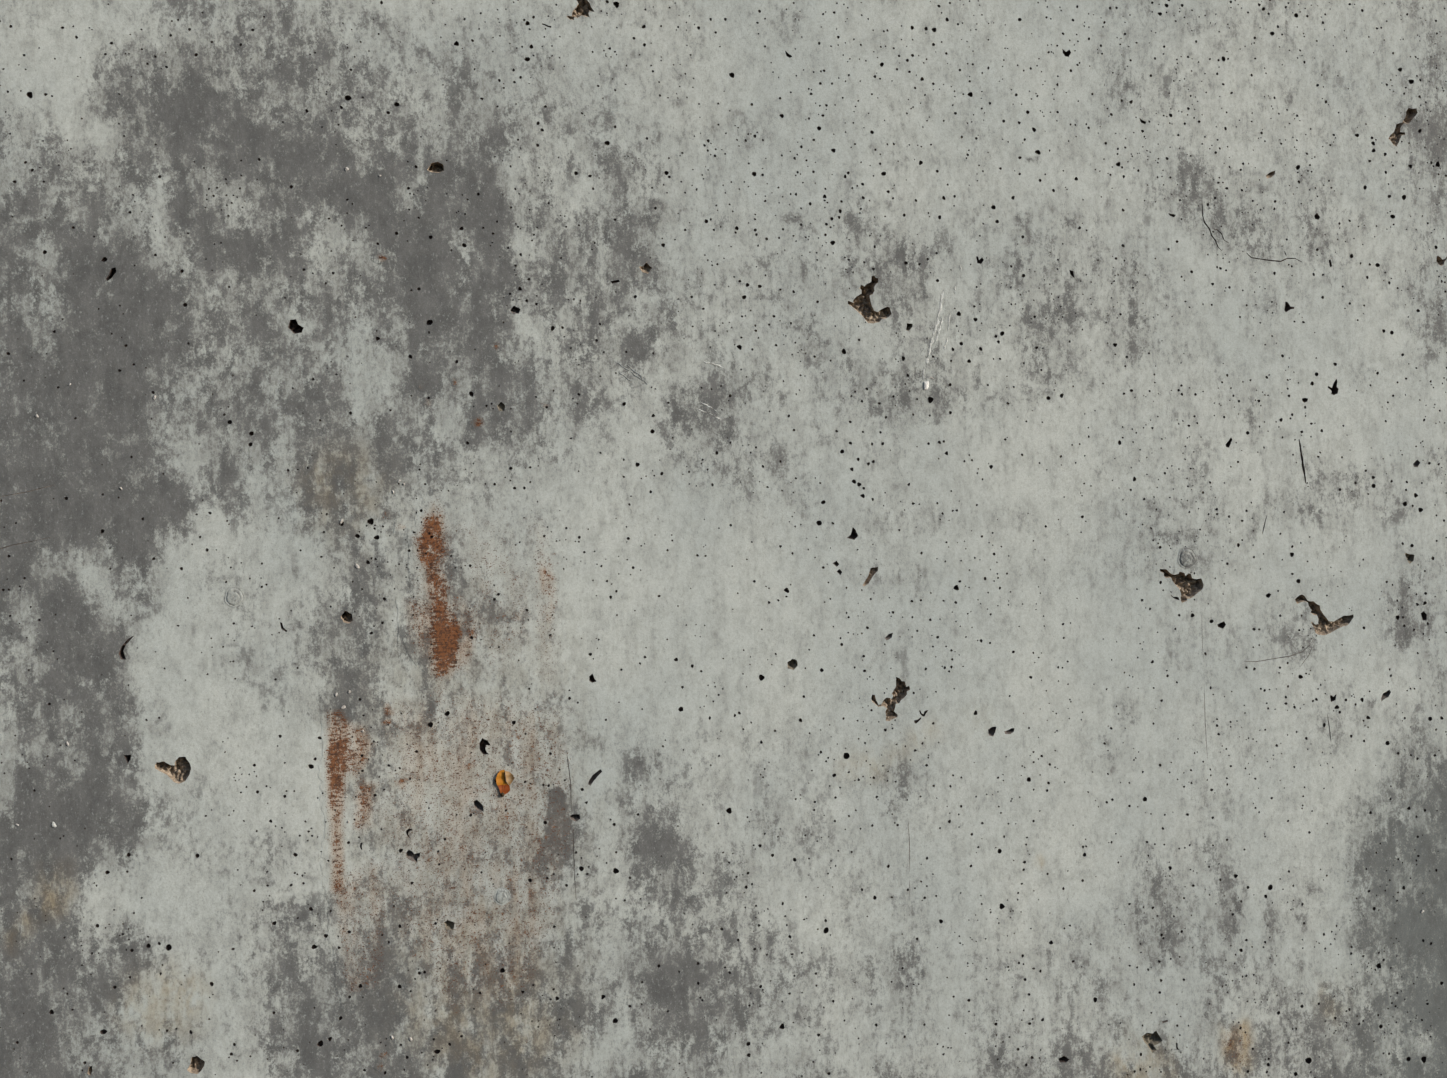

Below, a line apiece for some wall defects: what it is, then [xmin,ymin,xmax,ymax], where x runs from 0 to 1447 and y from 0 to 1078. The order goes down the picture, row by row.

spalling [848,276,892,323]
damp [657,340,754,462]
damp [0,32,711,1078]
spalling [1160,569,1204,603]
spalling [1295,595,1354,635]
corrosion [318,486,590,1031]
spalling [871,677,910,721]
damp [258,738,840,1078]
damp [971,725,1447,1078]
damp [867,943,927,1038]